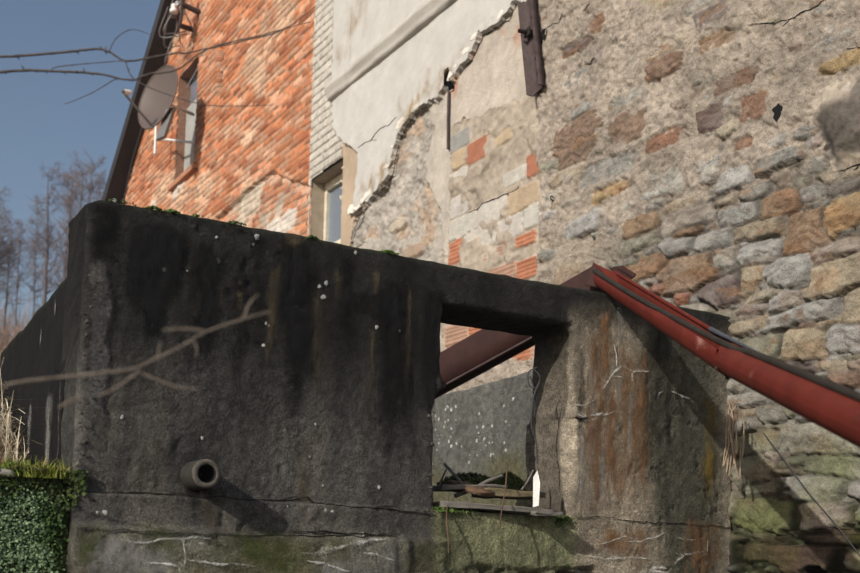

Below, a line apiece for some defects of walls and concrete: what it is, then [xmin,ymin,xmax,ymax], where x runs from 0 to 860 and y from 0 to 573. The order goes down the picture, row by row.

crack [756,0,824,26]
peeling [447,0,526,126]
peeling [347,101,445,264]
damp [125,223,185,336]
damp [193,245,220,350]
damp [423,291,443,411]
crack [607,345,648,383]
crack [575,400,614,421]
crack [74,490,434,515]
crack [84,527,395,572]
crack [576,516,728,573]